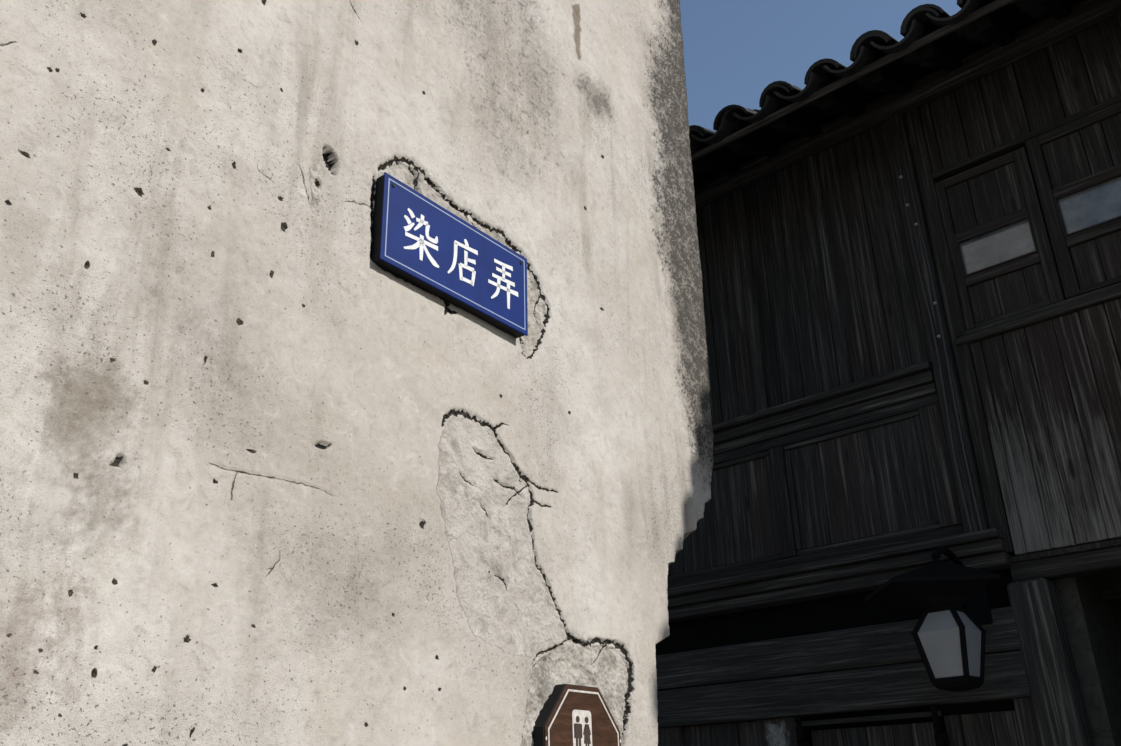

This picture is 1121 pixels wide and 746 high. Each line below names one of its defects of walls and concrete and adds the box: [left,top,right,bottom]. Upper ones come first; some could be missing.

spalling [378,162,511,249]
spalling [519,270,546,358]
damp [644,0,714,484]
peeling [437,415,629,746]